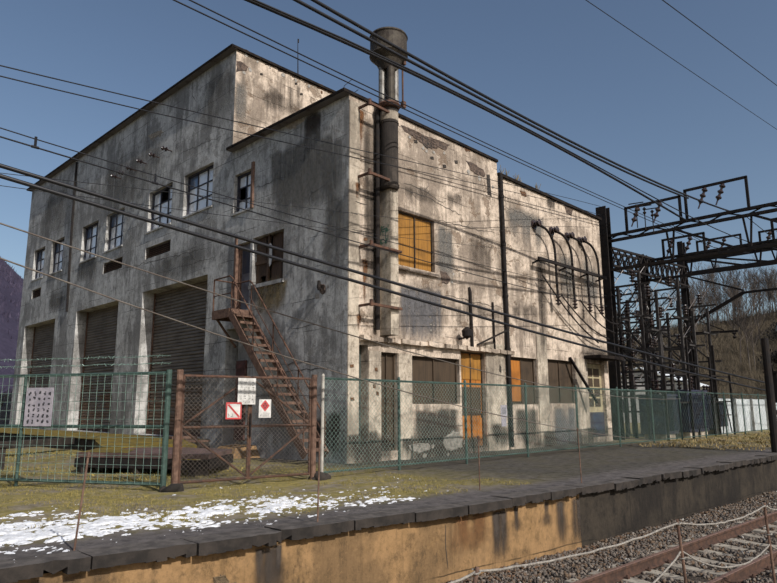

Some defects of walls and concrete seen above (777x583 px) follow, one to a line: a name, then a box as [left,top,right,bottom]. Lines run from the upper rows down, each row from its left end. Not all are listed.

spalling [401,125,449,160]
spalling [443,147,494,197]
leakage [401,287,441,335]
leakage [492,507,518,547]
leakage [545,498,581,537]
leakage [256,545,282,583]